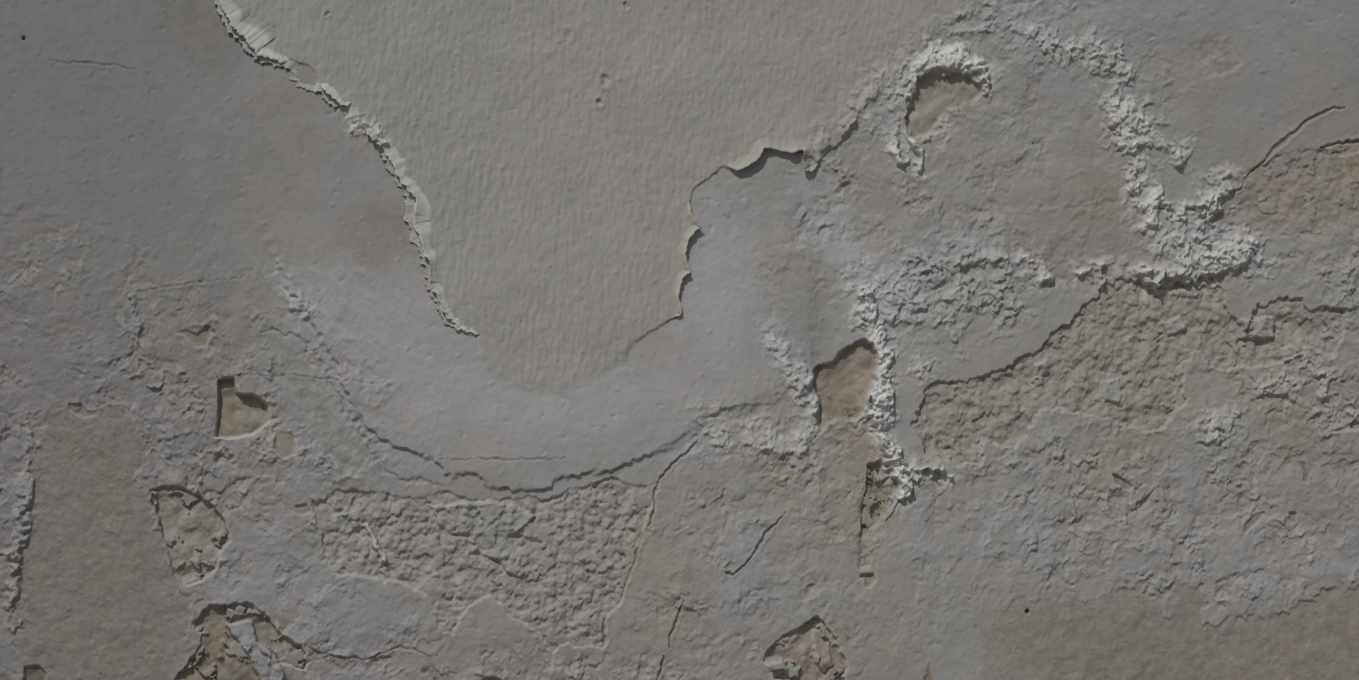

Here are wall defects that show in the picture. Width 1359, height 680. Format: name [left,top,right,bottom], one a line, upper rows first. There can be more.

peeling [213,0,988,390]
leakage [767,0,1267,512]
crack [1245,106,1359,178]
spalling [214,377,299,462]
spalling [697,337,882,459]
spalling [910,246,1359,469]
flaking render [3,401,312,680]
spalling [310,476,662,657]
crack [602,439,701,651]
spalling [761,614,853,680]
spalling [858,459,901,586]